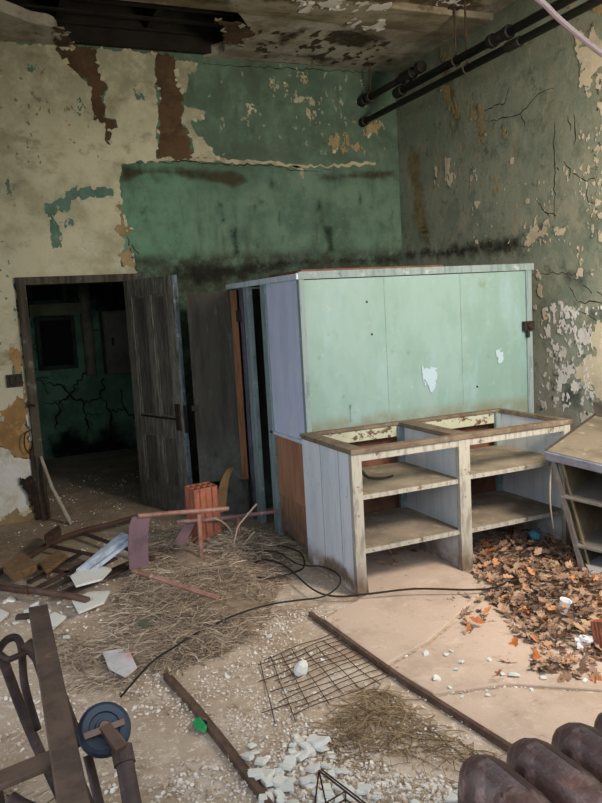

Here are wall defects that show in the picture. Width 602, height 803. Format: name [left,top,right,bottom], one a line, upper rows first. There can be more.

leakage [121,167,144,180]
leakage [176,169,244,186]
peeling [269,0,392,155]
leakage [331,31,379,47]
leakage [344,0,482,11]
crack [483,88,554,124]
crack [538,117,595,217]
peeling [563,4,602,242]
peeling [0,0,290,525]
peeling [524,180,595,279]
peeling [533,269,602,423]
crack [46,373,135,433]